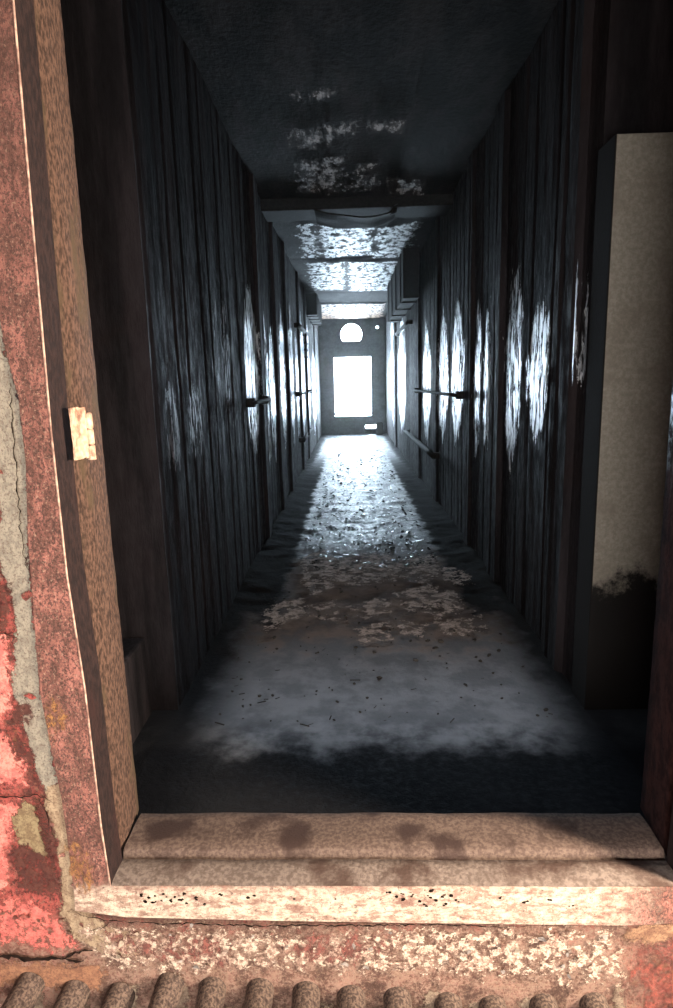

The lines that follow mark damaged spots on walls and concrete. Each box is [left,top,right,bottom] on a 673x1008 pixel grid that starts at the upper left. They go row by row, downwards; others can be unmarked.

crack [0,911,525,963]
peeling [0,323,673,1008]